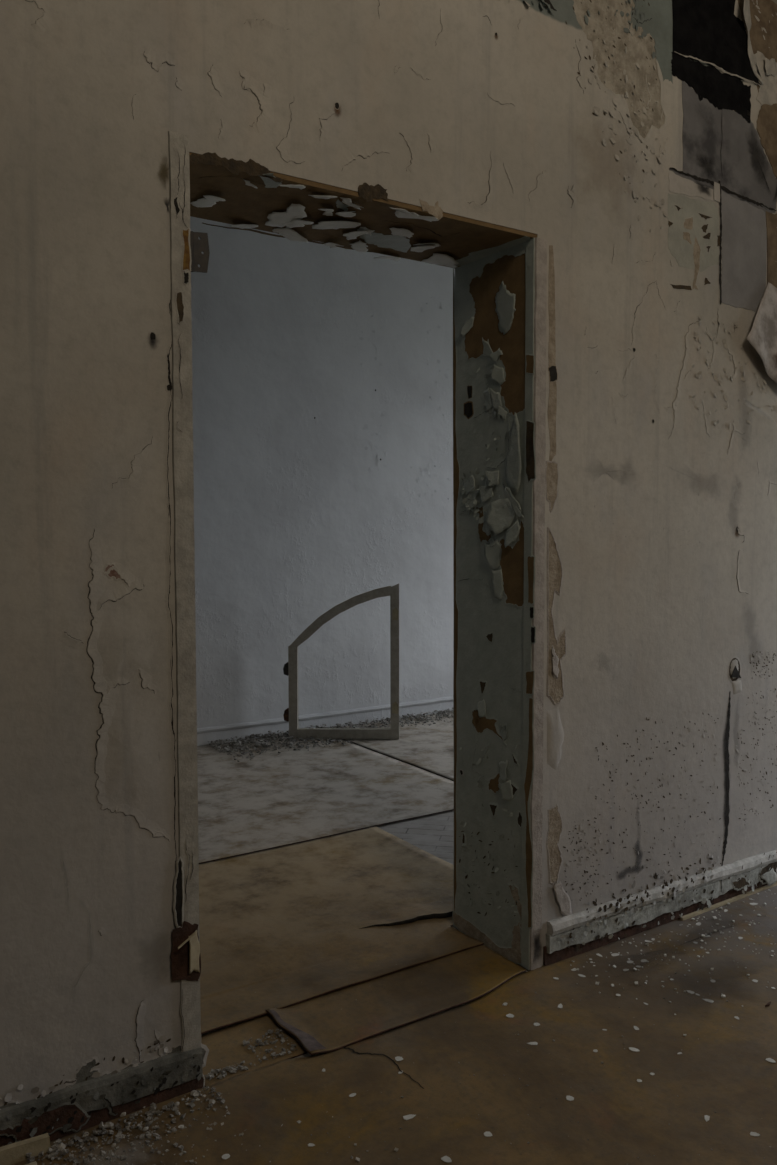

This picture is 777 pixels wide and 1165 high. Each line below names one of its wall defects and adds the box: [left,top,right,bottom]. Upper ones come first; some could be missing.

peeling [173,195,226,270]
flaking render [566,0,720,292]
peeling [189,152,777,952]
peeling [0,1031,209,1145]